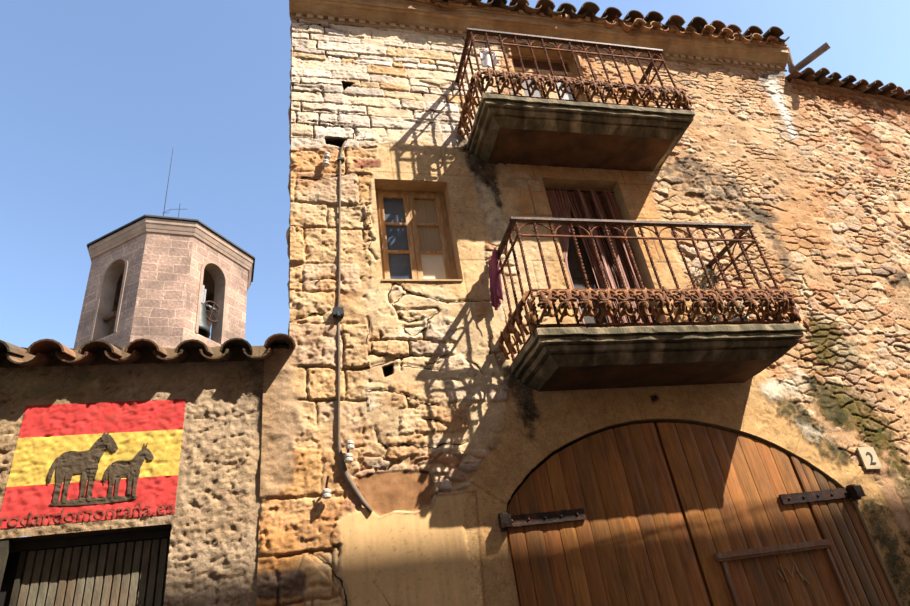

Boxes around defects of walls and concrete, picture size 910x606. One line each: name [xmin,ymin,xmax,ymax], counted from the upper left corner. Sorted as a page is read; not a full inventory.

crack [362,210,375,258]
damp [457,138,521,320]
damp [832,339,863,368]
damp [498,356,539,438]
damp [759,369,852,468]
damp [880,433,910,513]
crack [308,552,348,606]